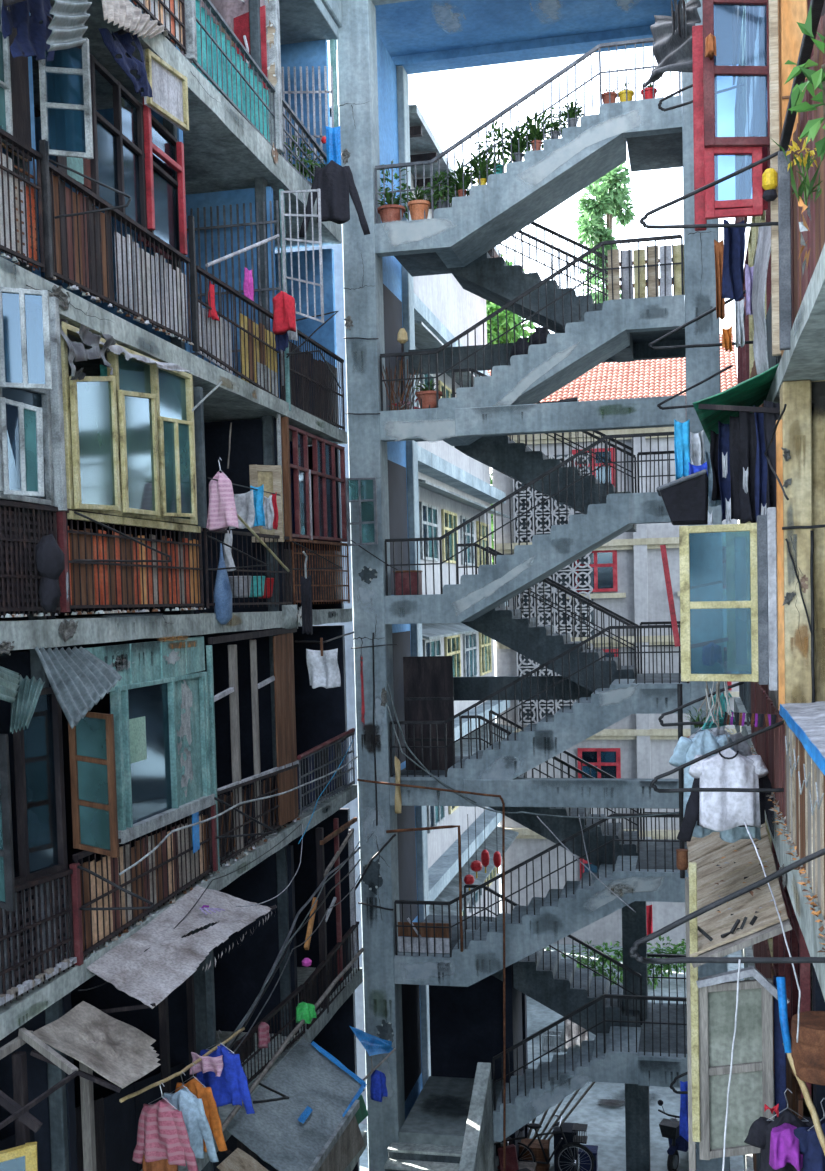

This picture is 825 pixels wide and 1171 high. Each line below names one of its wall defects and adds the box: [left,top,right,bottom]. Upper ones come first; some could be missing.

damp [424,1096,469,1116]